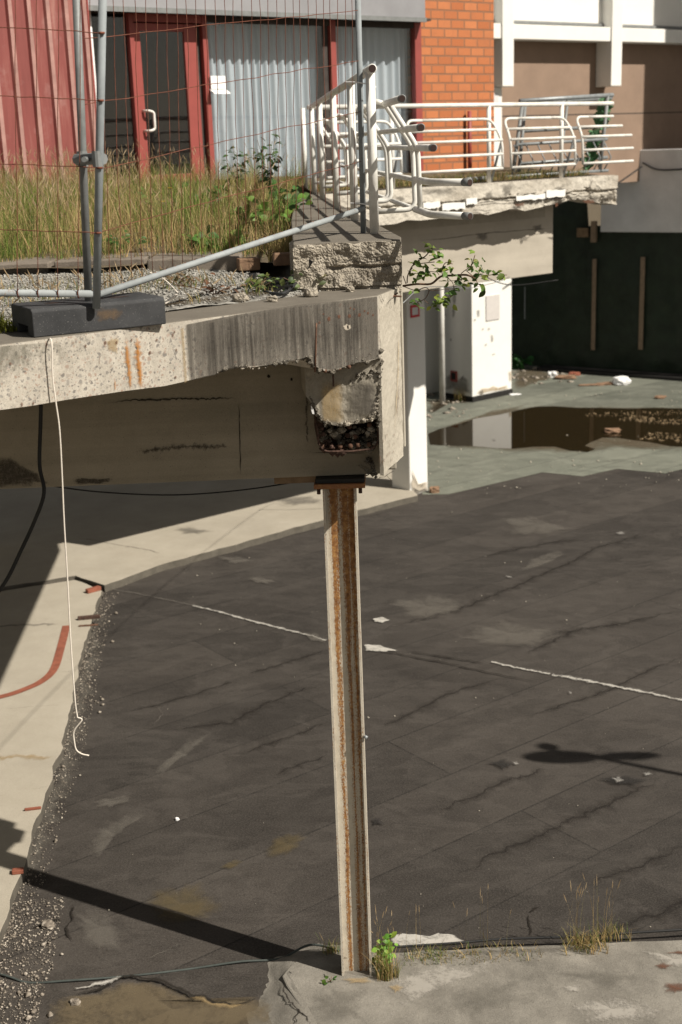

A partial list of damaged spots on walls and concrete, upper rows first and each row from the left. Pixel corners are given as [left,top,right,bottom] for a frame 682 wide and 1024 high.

peeling [423,198,477,211]
peeling [516,189,565,204]
corrosion [105,339,157,386]
spalling [211,323,384,479]
crack [121,397,241,469]
crack [283,987,308,1022]